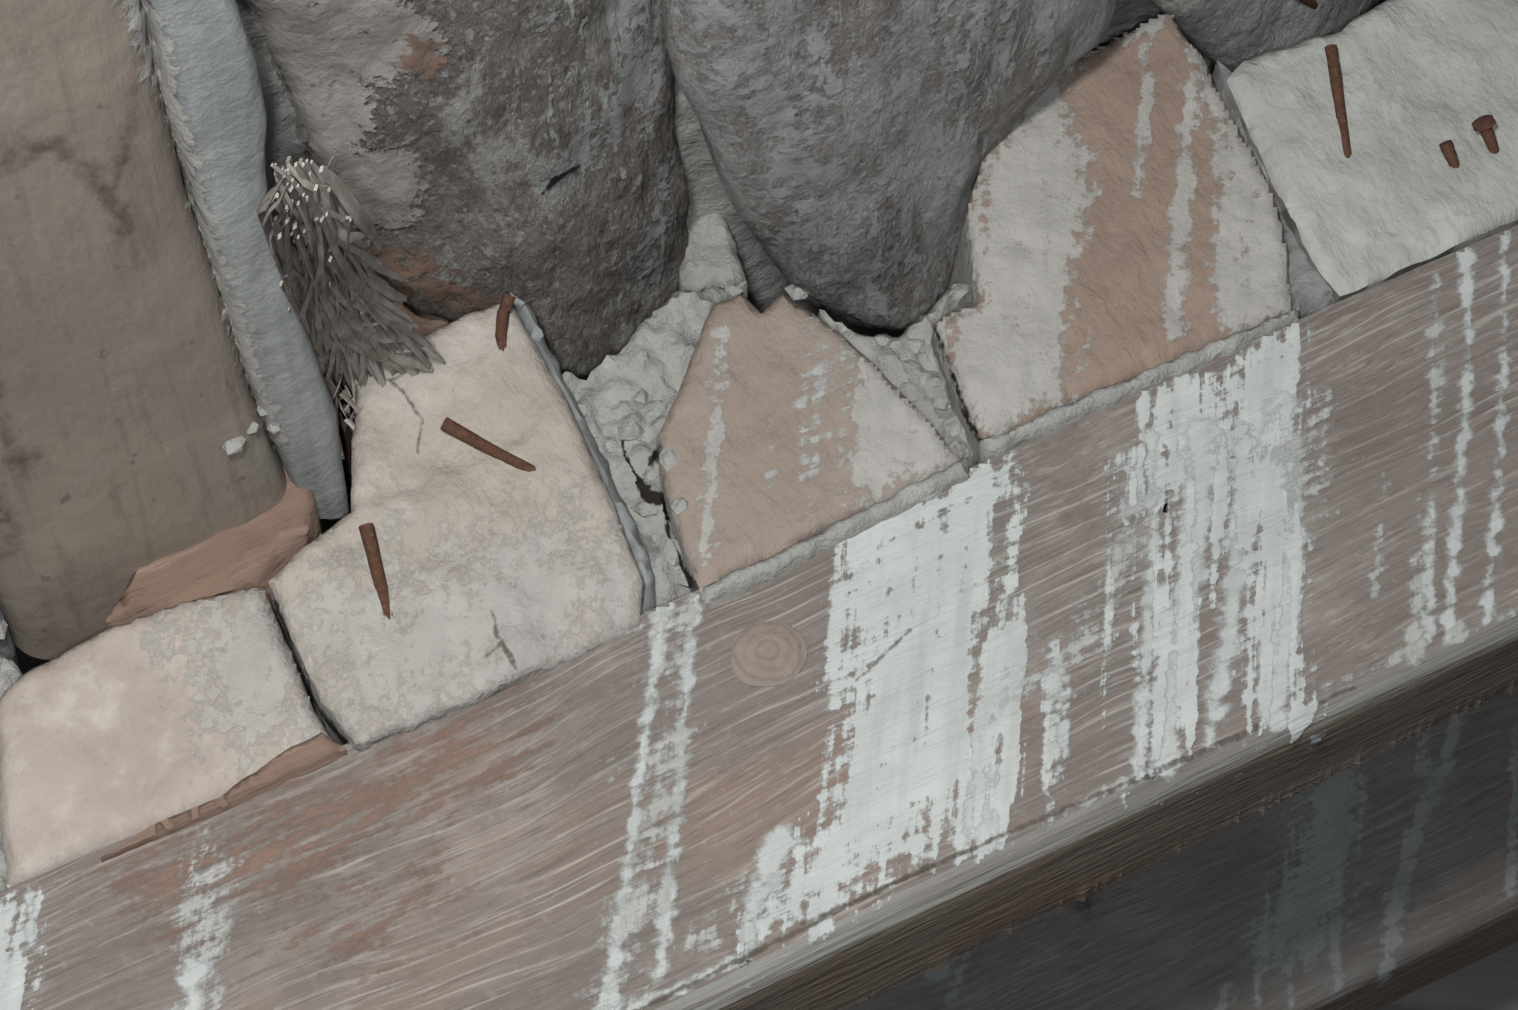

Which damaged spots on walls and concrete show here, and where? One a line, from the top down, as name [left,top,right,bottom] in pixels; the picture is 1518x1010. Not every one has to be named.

spalling [900,338,962,436]
spalling [0,620,8,639]
spalling [0,658,15,673]